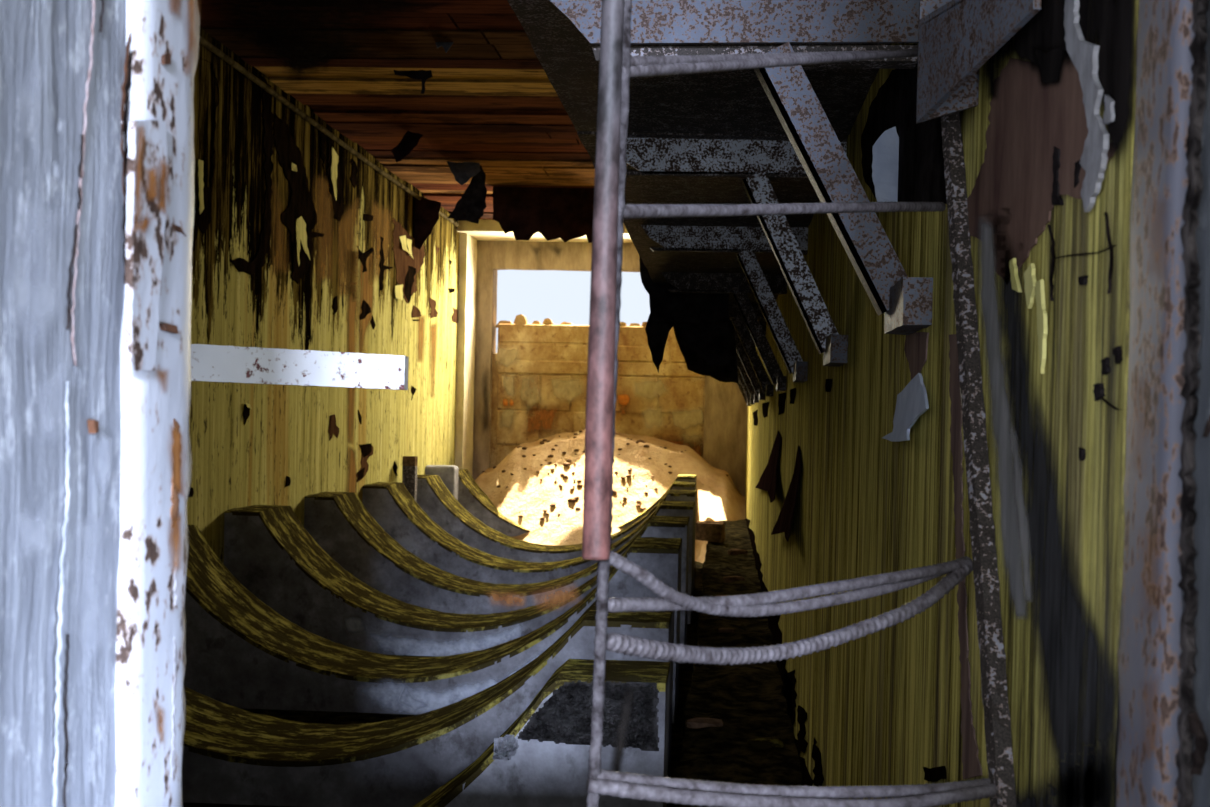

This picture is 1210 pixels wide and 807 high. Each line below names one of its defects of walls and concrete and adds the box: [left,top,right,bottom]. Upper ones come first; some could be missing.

corrosion [161,53,171,64]
corrosion [171,0,194,51]
corrosion [134,127,167,232]
peeling [192,59,219,252]
peeling [231,76,324,284]
peeling [319,130,358,221]
peeling [391,131,423,163]
peeling [967,0,1115,374]
peeling [359,299,376,330]
spalling [1093,346,1123,401]
corrosion [172,428,183,494]
corrosion [171,517,180,569]